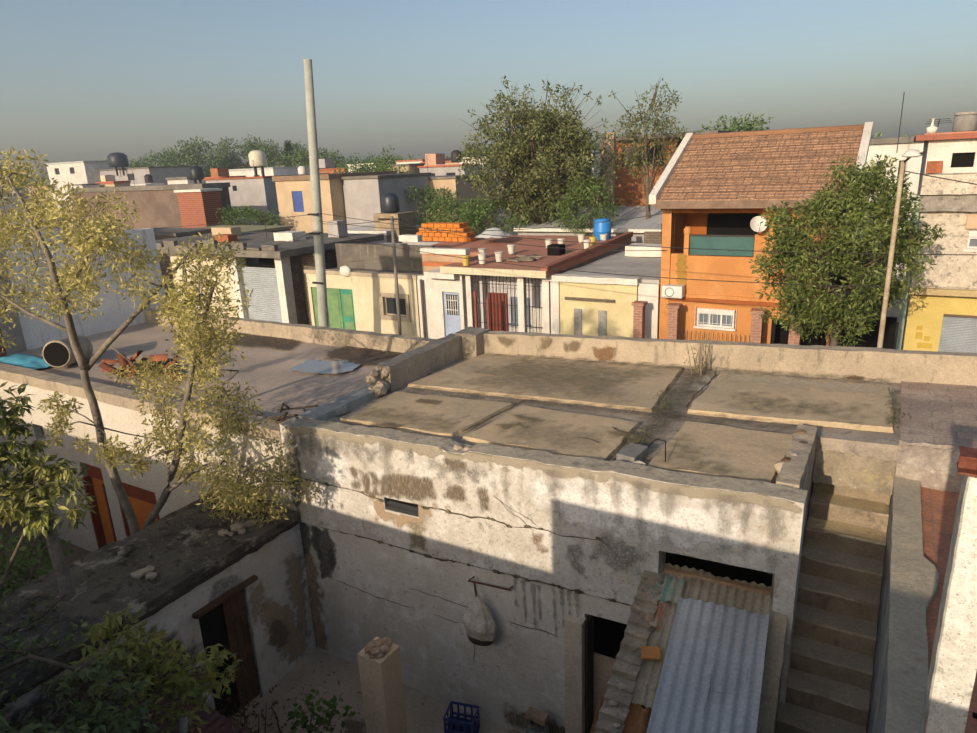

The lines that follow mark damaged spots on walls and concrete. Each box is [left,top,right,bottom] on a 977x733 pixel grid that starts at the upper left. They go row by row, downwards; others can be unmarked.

damp [283,433,383,578]
crack [293,474,385,502]
damp [350,468,434,500]
damp [441,460,476,501]
damp [478,488,488,510]
damp [410,525,425,550]
crack [421,495,613,550]